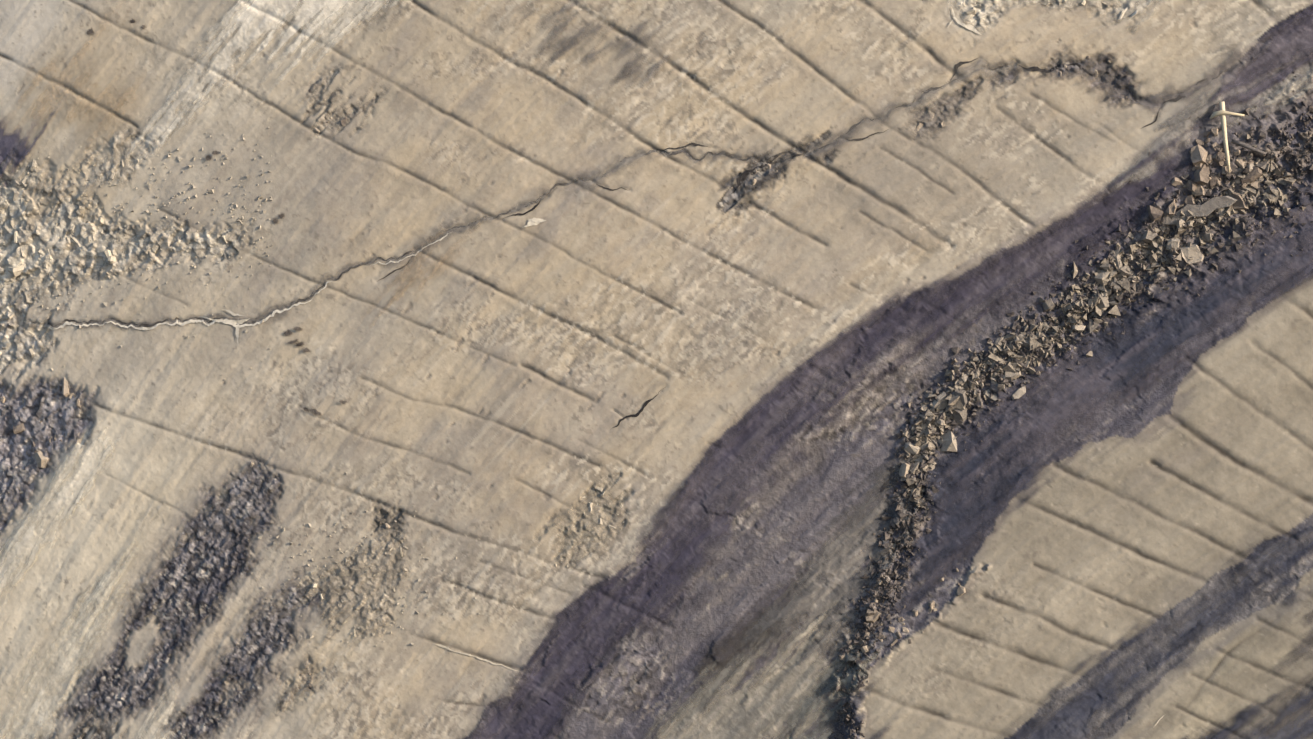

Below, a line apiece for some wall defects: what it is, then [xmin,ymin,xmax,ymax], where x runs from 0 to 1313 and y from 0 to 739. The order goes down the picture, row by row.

spalling [0,0,399,531]
crack [30,51,1241,330]
spalling [910,49,1146,138]
spalling [1043,128,1309,343]
crack [611,391,660,429]
spalling [899,332,1038,479]
spalling [50,460,282,739]
spalling [166,508,408,739]
spalling [839,572,937,689]